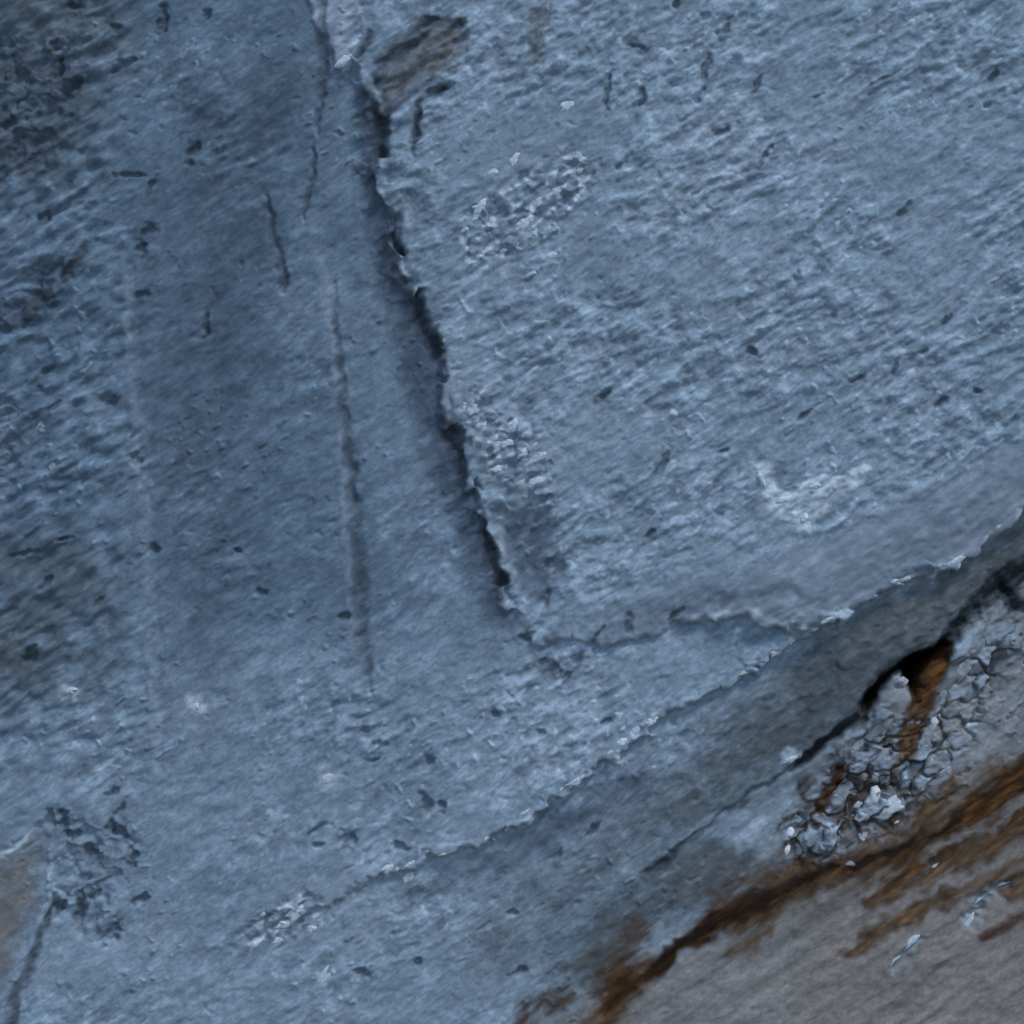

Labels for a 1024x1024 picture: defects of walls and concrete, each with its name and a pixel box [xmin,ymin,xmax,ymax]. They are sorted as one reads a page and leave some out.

peeling [373,14,467,107]
spalling [450,379,556,597]
spalling [778,622,1019,872]
crack [795,561,1024,765]
rust [899,643,953,759]
crack [655,832,696,869]
rust [582,755,1024,1024]
rust [516,986,571,1024]